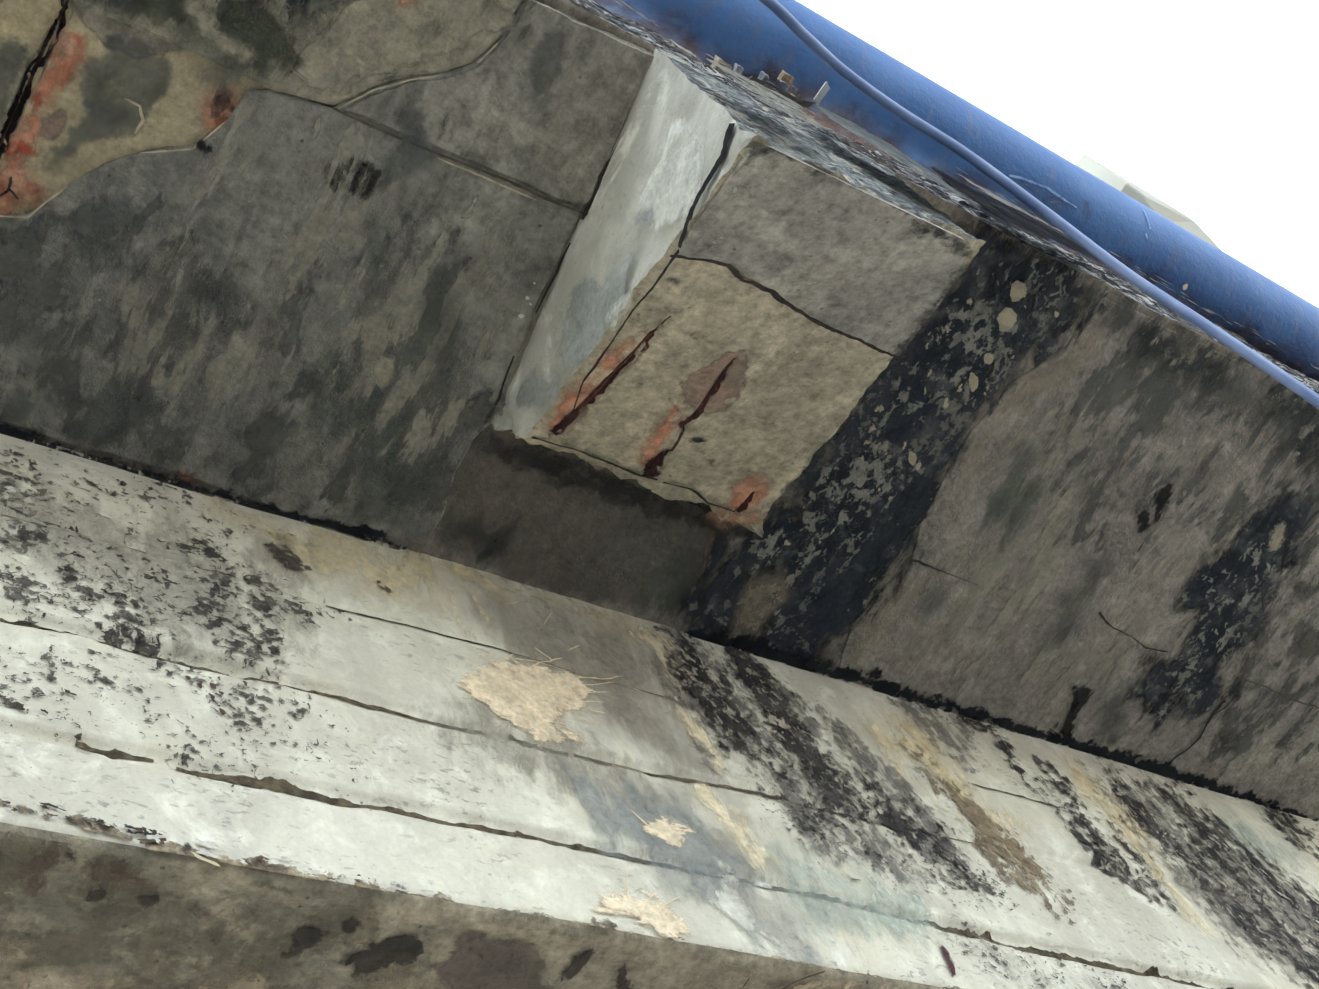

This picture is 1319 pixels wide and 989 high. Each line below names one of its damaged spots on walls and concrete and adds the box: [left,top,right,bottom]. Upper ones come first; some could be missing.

peeling [184,0,254,60]
spalling [0,0,83,214]
water stain [931,167,1113,271]
water stain [558,123,735,432]
crack [670,255,900,359]
rust [721,477,768,521]
water stain [0,445,344,781]
crack [1098,611,1168,652]
crack [1168,678,1319,764]
spalling [0,800,454,902]
water stain [452,702,860,943]
spalling [576,916,684,941]